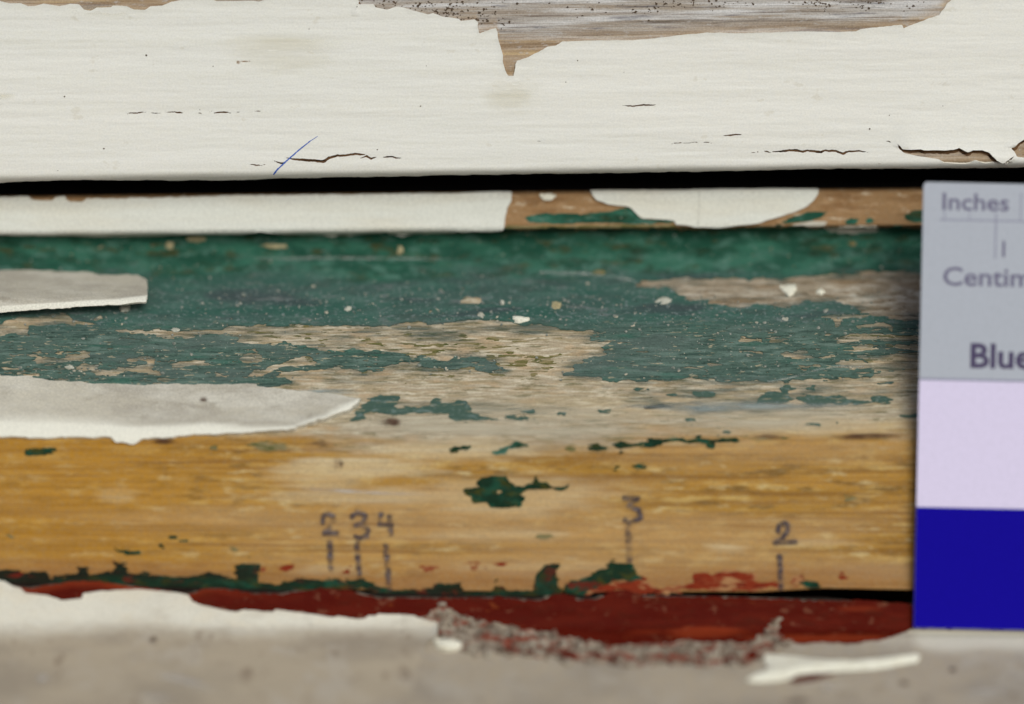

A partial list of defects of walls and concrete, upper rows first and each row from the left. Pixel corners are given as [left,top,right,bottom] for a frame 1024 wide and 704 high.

peeling [0,0,178,11]
peeling [359,0,951,76]
crack [227,153,398,166]
crack [674,134,890,155]
peeling [504,193,680,230]
peeling [768,190,923,228]
peeling [0,270,148,336]
peeling [636,271,921,374]
peeling [0,297,606,445]
peeling [0,580,462,704]